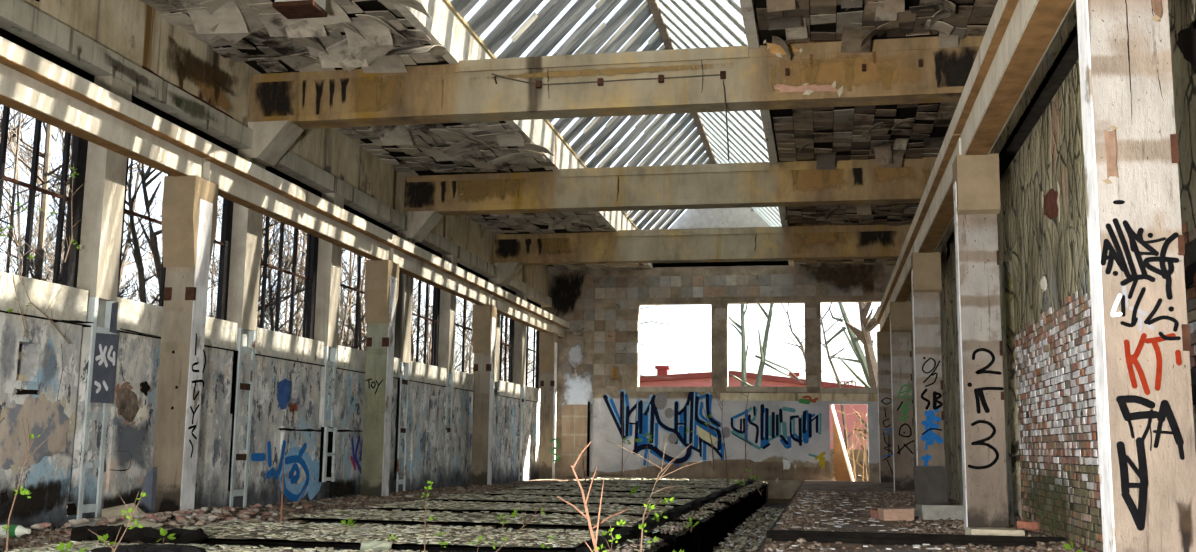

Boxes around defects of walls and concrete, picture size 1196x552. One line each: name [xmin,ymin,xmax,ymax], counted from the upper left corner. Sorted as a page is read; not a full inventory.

spalling [763,40,803,57]
crack [1125,0,1188,120]
spalling [774,81,843,97]
spalling [114,381,152,426]
flaking render [0,386,76,473]
flaking render [66,503,78,517]
damp [1181,532,1190,552]